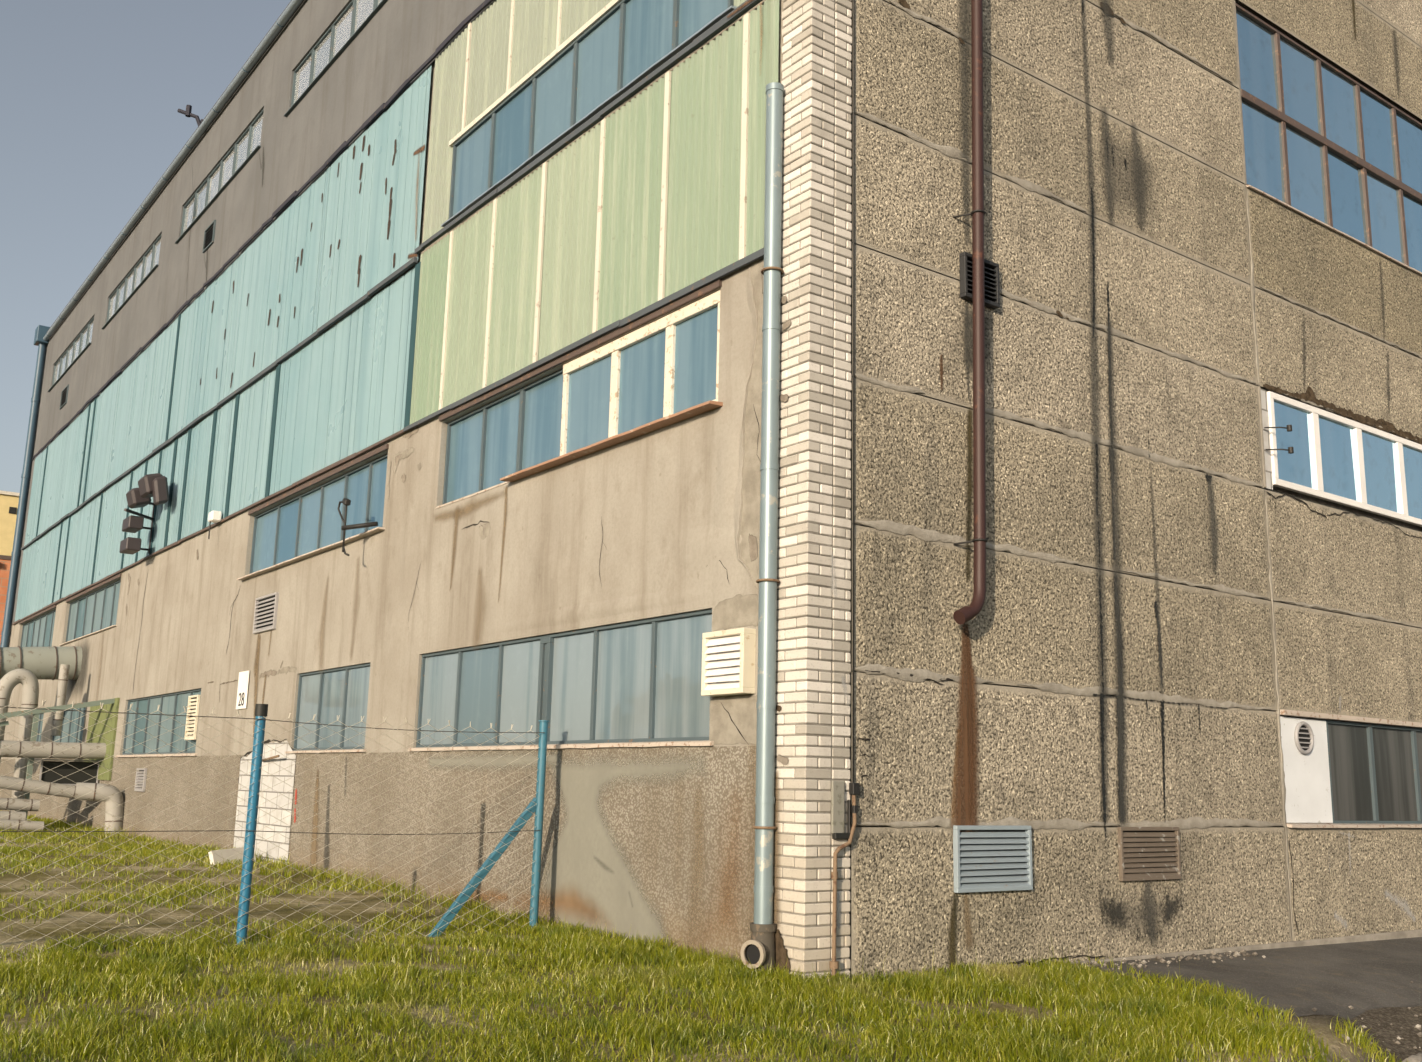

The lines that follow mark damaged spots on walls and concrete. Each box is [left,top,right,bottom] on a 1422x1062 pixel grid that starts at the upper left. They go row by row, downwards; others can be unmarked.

damp [1082,0,1227,842]
crack [1266,491,1422,538]
rust [954,622,978,839]
damp [1099,880,1182,942]